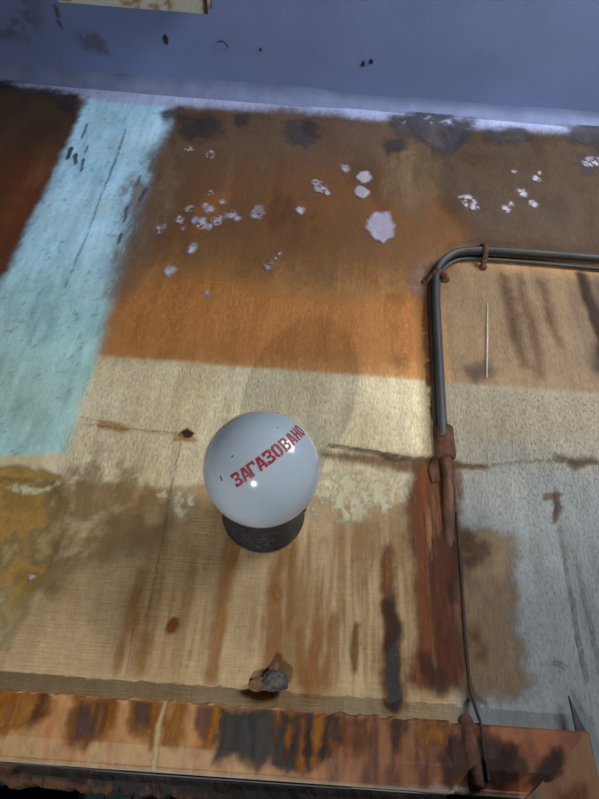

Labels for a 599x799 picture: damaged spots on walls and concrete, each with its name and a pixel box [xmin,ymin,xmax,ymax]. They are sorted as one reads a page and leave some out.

crack [76,130,126,260]
water stain [382,112,599,254]
crack [328,444,429,461]
crack [458,458,599,467]
peeling [0,465,70,648]
rust [327,453,487,696]
rust [0,690,50,732]
rust [419,724,471,793]
rust [477,738,564,788]